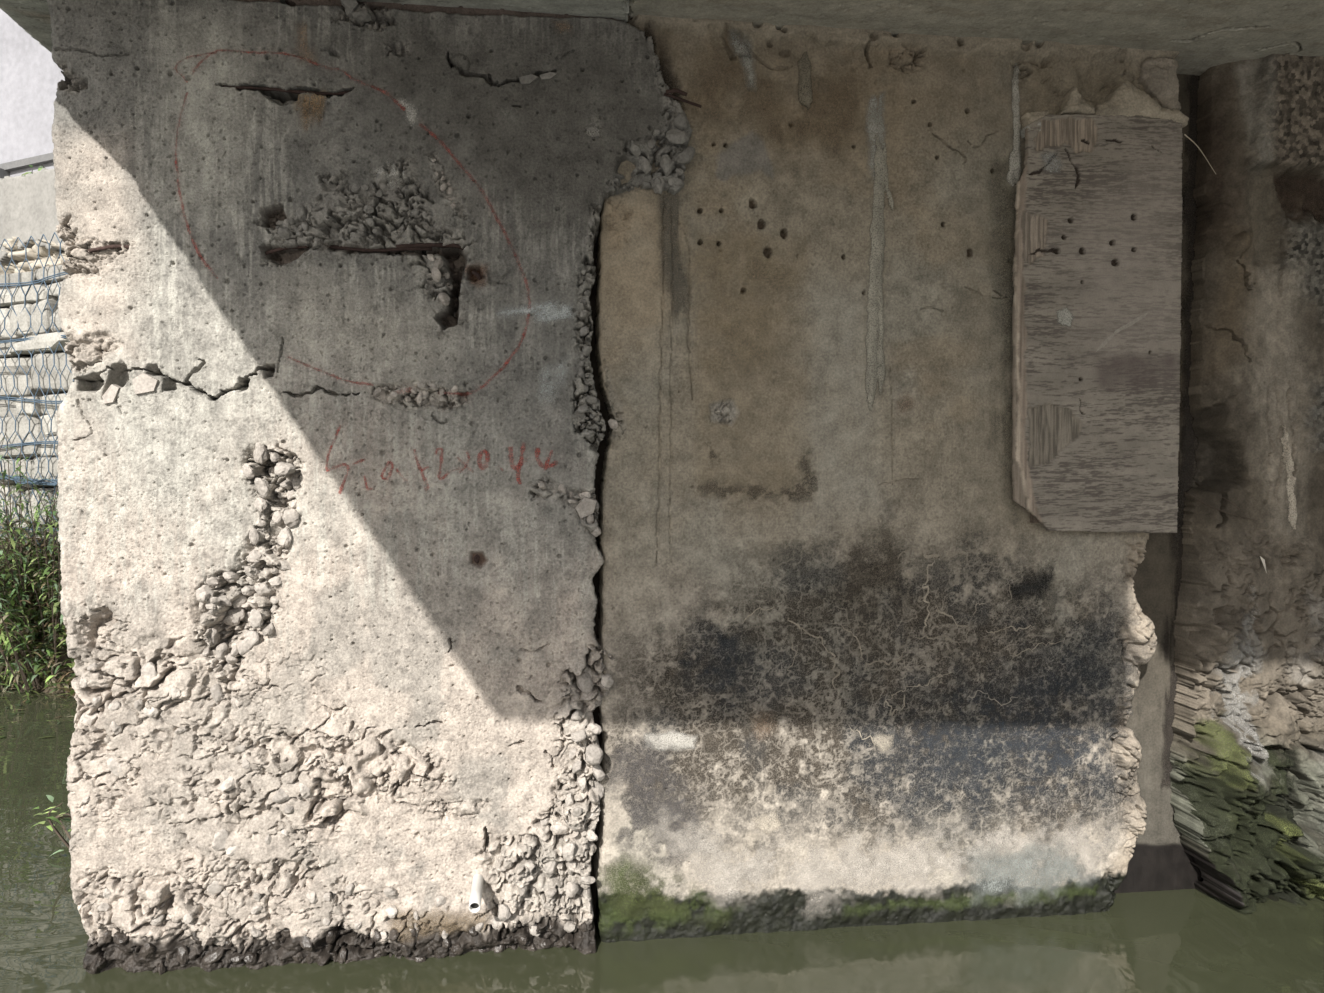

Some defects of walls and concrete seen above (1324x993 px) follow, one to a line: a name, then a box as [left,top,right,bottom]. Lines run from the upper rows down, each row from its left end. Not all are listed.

crack [216,82,355,106]
crack [447,49,575,87]
spalling [256,160,482,336]
spalling [573,31,702,450]
crack [73,336,366,440]
spalling [528,476,601,539]
spalling [77,605,119,656]
spalling [1172,527,1324,735]
leakage [607,541,1134,903]
spalling [416,798,492,847]
spalling [72,858,540,948]
spalling [557,912,581,933]